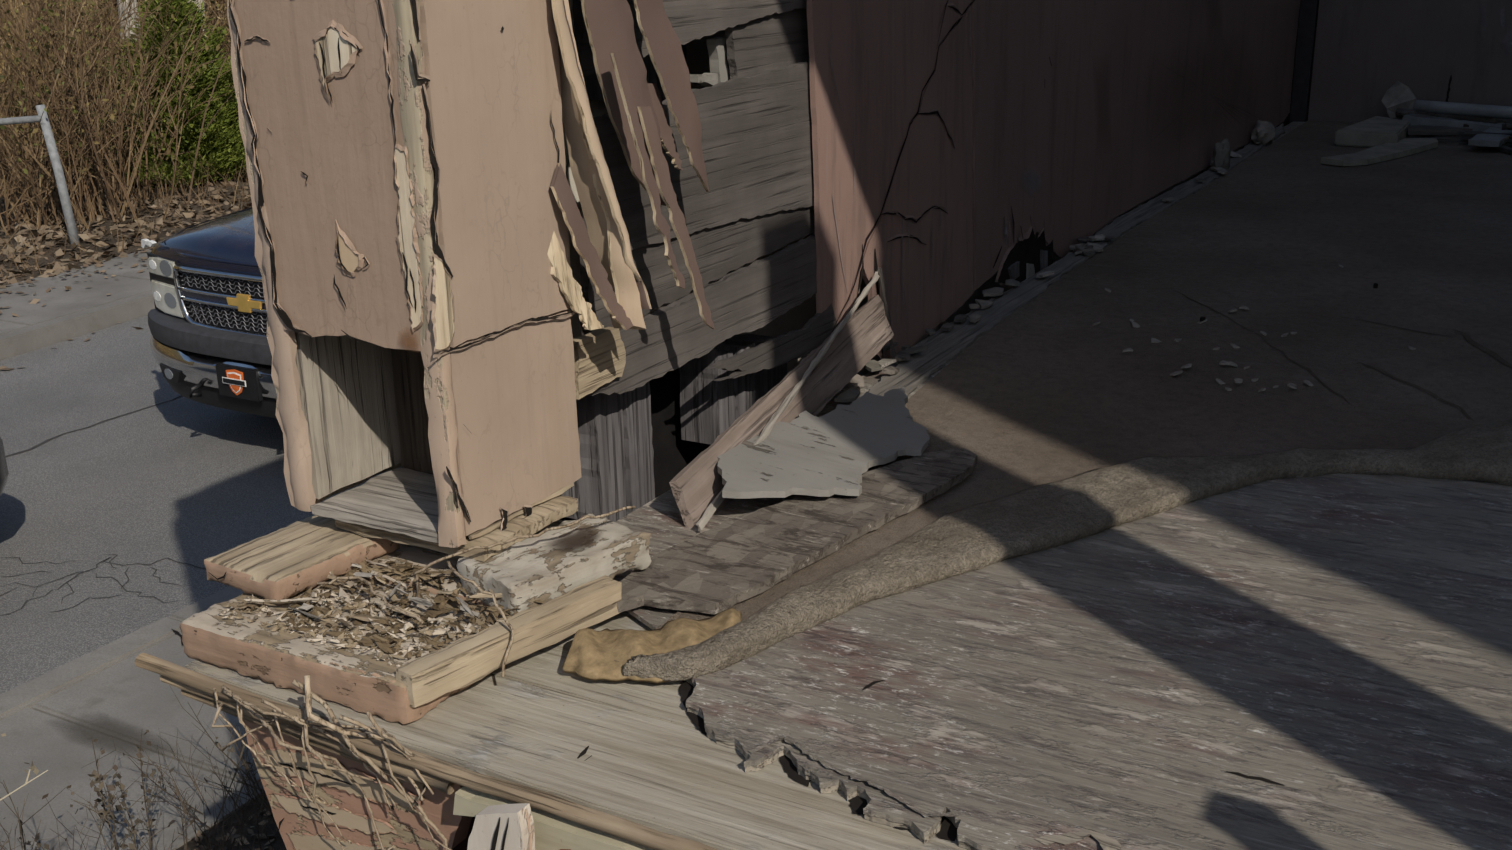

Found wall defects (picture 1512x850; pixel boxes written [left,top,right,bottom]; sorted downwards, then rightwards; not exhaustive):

peeling [313,20,363,104]
crack [832,0,975,332]
peeling [334,221,364,307]
peeling [394,144,455,353]
peeling [969,221,1054,323]
crack [433,311,575,358]
hole [649,368,711,498]